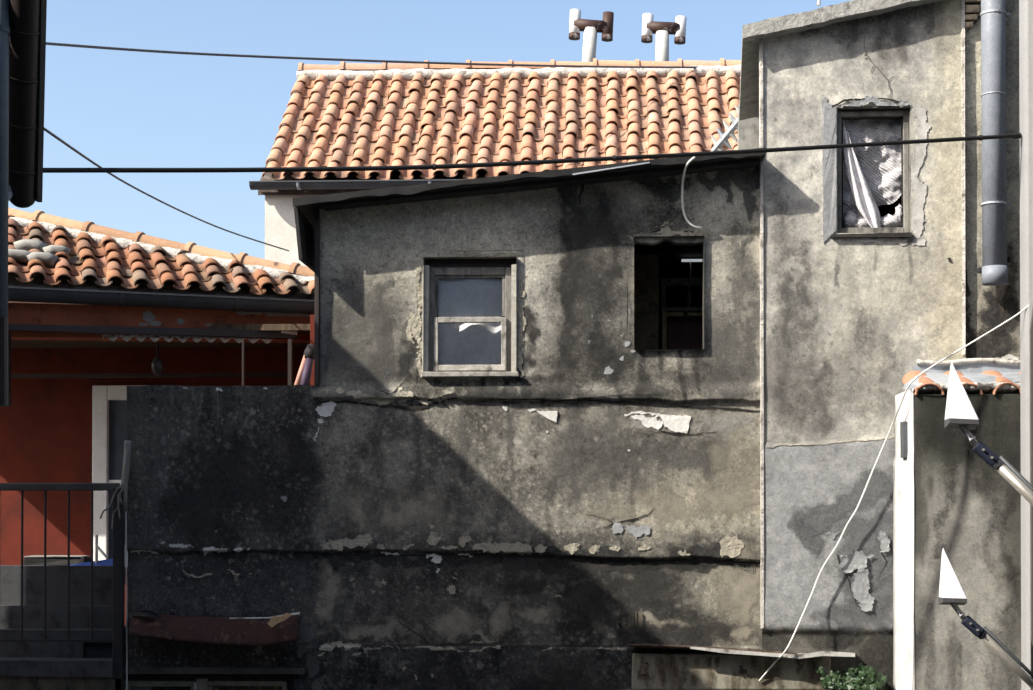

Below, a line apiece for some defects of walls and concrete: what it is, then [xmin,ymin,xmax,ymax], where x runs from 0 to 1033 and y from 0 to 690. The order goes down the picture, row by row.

crack [830,33,900,108]
peeling [406,266,423,378]
peeling [454,250,527,378]
leakage [324,166,760,505]
peeling [313,387,451,441]
crack [316,374,760,437]
peeling [528,409,557,433]
peeling [624,411,691,434]
leakage [130,424,321,555]
leakage [313,524,758,690]
crack [321,508,760,568]
leakage [787,467,894,690]